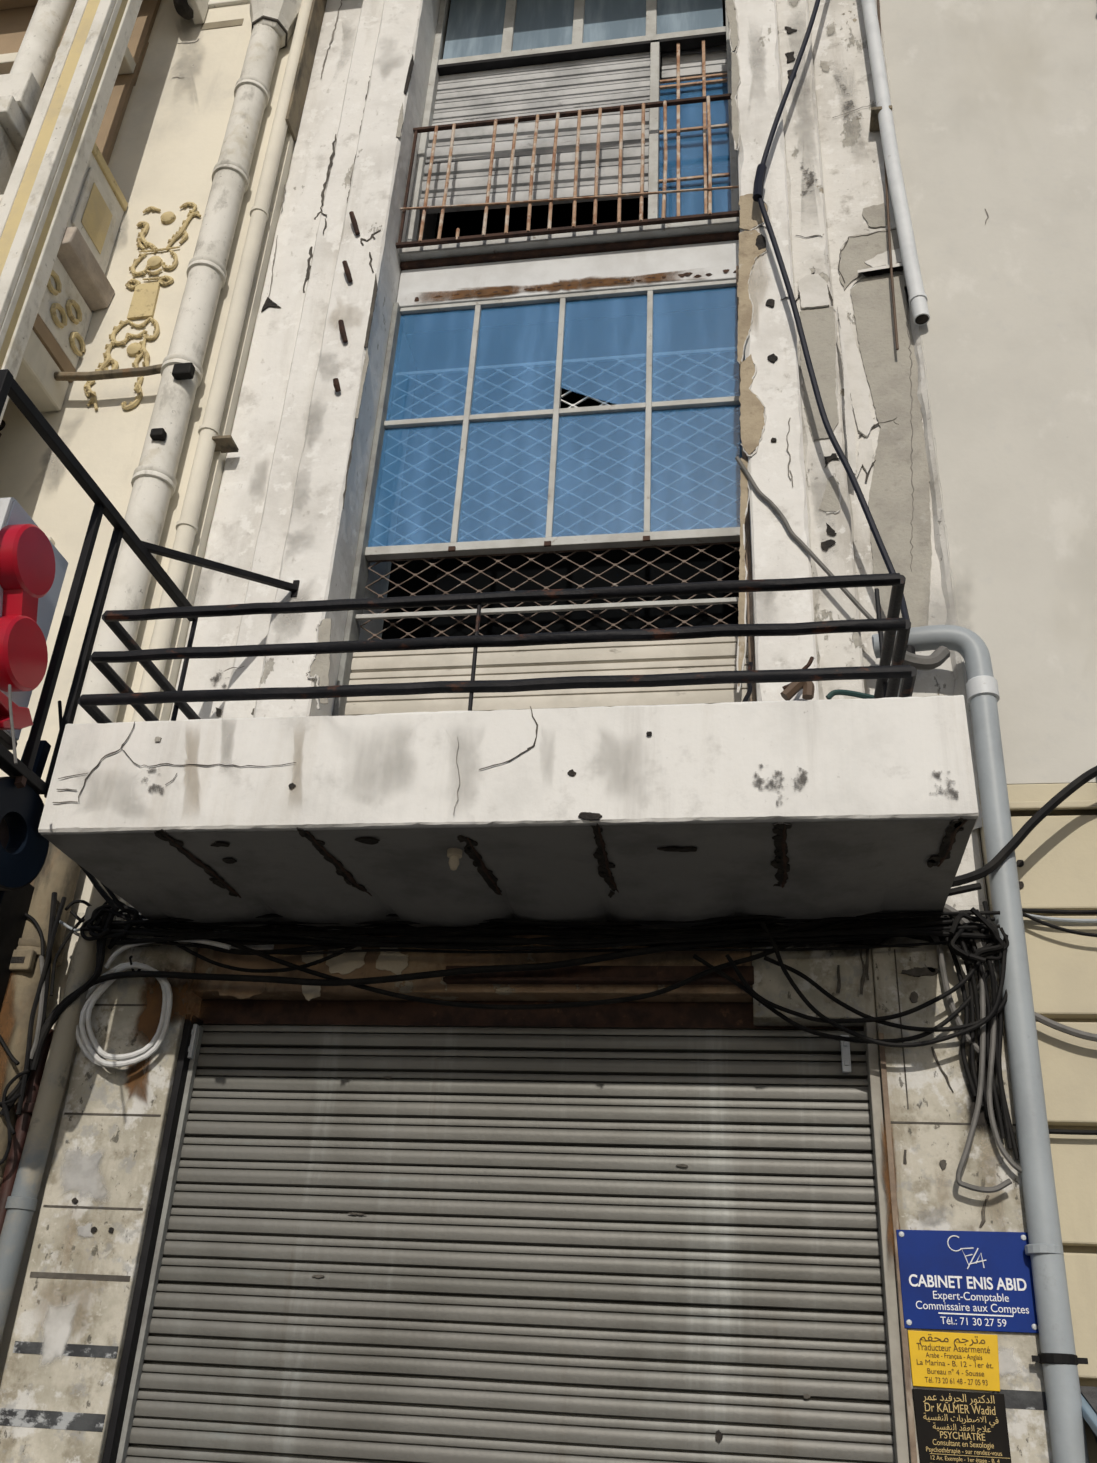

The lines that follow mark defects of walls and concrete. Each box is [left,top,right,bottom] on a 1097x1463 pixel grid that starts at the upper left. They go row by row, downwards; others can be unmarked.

crack [321,0,342,78]
flaking render [726,0,741,151]
peeling [785,26,797,78]
crack [261,76,370,312]
crack [360,230,381,272]
corrosion [423,271,677,302]
flaking render [736,194,778,694]
flaking render [795,203,932,632]
crack [53,722,296,803]
crack [453,706,538,815]